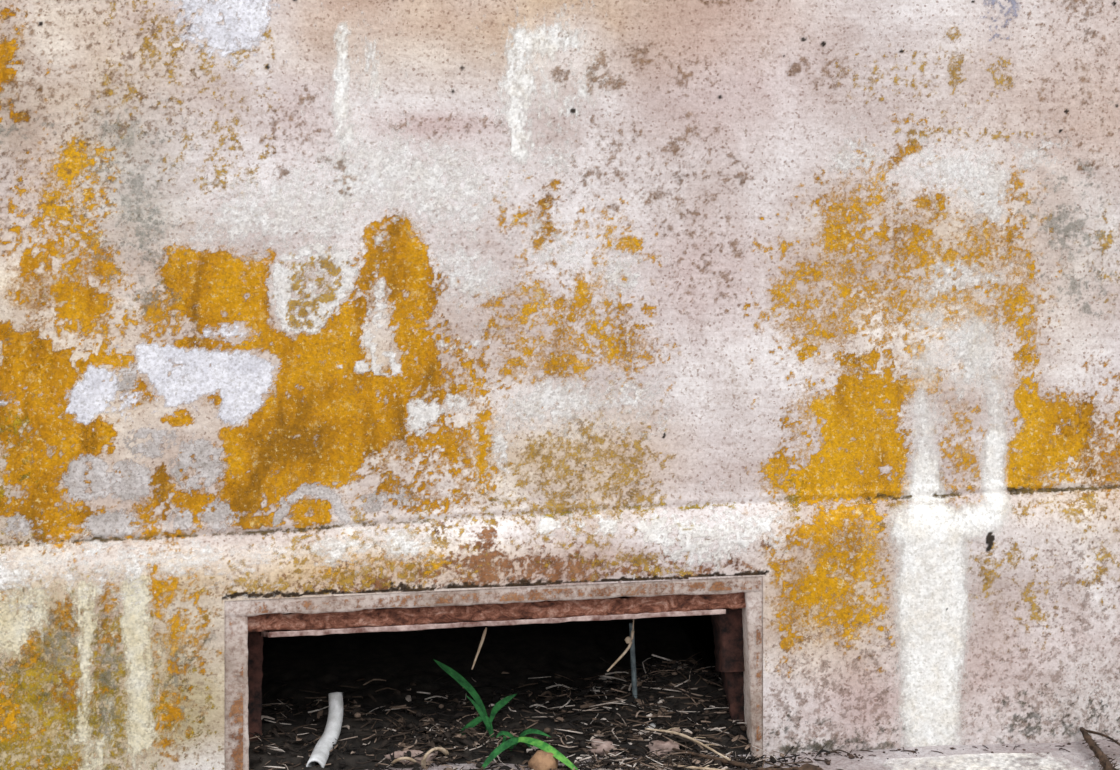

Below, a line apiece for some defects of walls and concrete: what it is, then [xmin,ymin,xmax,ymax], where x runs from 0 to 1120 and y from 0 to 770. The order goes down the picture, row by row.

peeling [66,323,280,430]